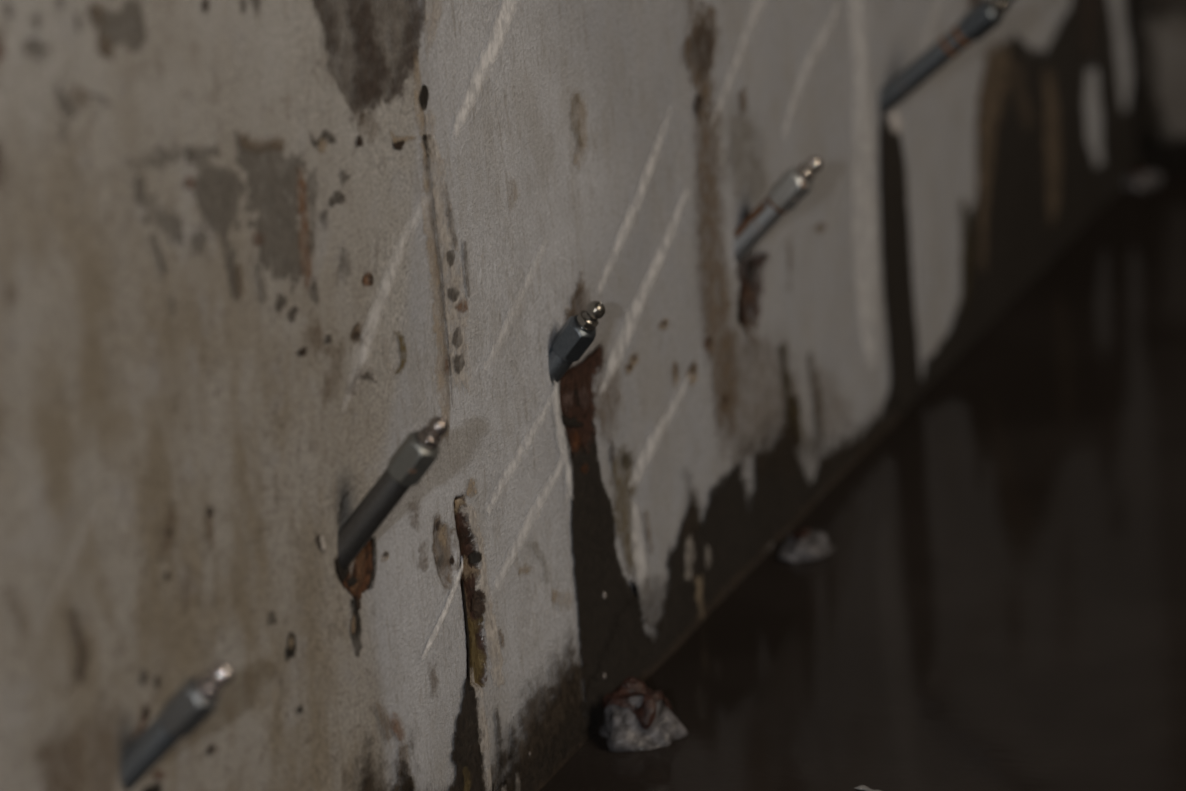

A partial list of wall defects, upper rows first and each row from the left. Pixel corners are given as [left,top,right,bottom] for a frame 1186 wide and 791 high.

damp [314,0,425,117]
damp [144,132,316,299]
damp [450,0,1186,791]
damp [361,738,414,791]